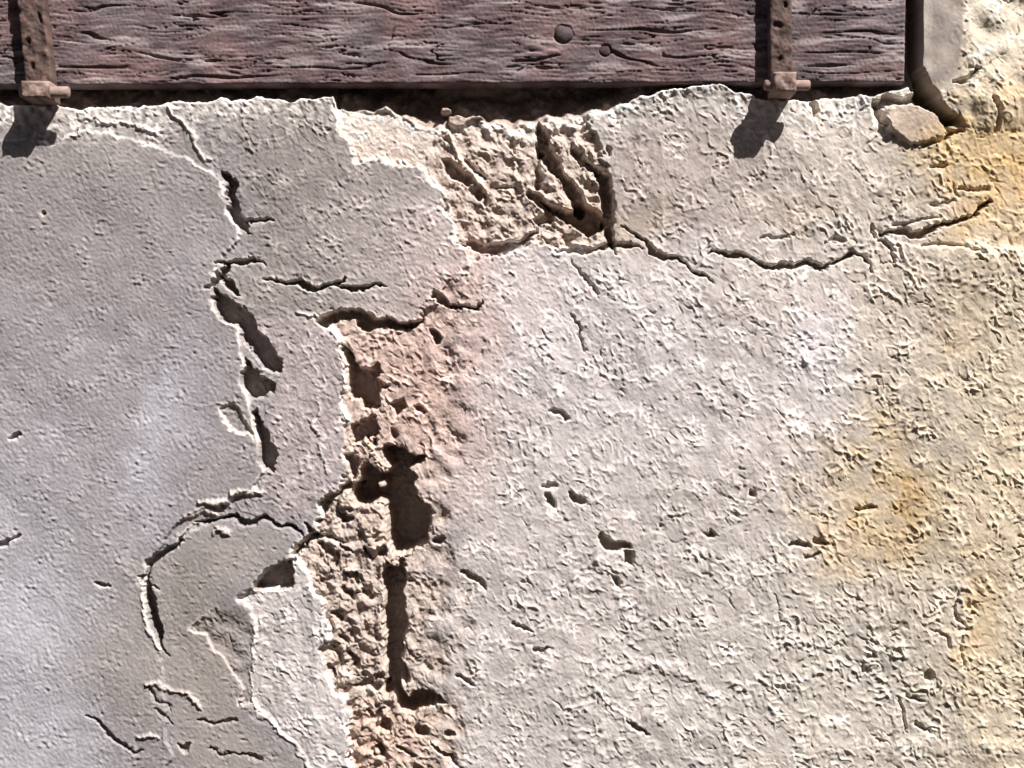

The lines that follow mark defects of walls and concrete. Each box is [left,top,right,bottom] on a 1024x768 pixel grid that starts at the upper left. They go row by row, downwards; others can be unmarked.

flaking render [333,99,617,262]
crack [456,122,993,300]
crack [569,313,588,354]
crack [137,513,305,657]
flaking render [297,273,488,768]
spalling [510,620,550,658]
crack [84,714,145,755]
crack [143,685,264,763]